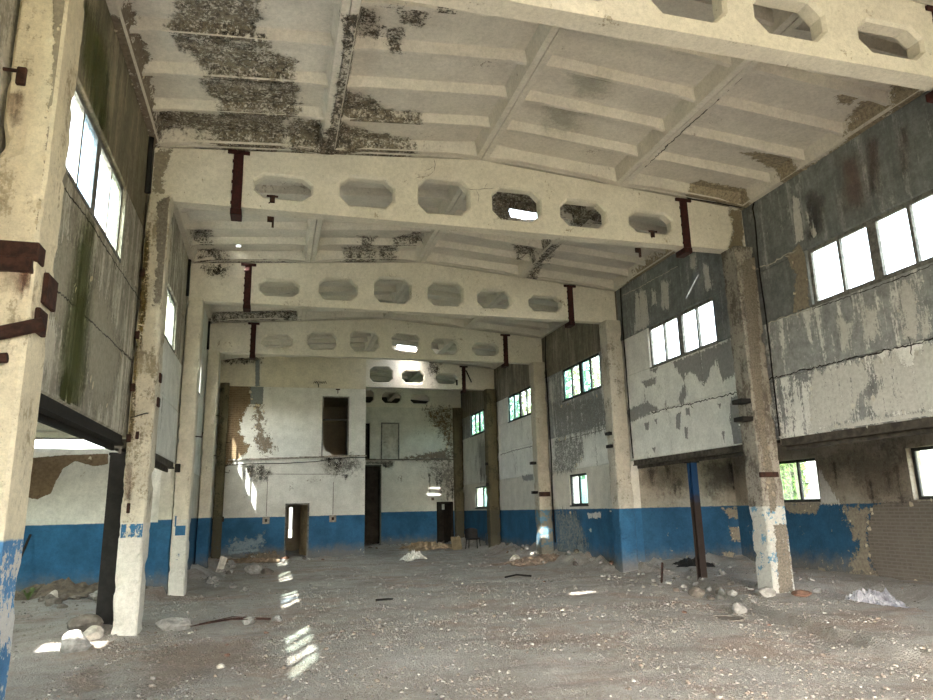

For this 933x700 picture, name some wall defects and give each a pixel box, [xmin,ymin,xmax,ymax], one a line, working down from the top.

crack [645,79,741,167]
spalling [685,179,750,248]
leakage [60,243,87,405]
crack [769,329,933,381]
flaking render [225,386,279,467]
flaking render [404,404,453,462]
flaking render [29,454,108,499]
peeling [556,508,611,554]
spalling [773,523,794,593]
peeling [784,468,877,576]